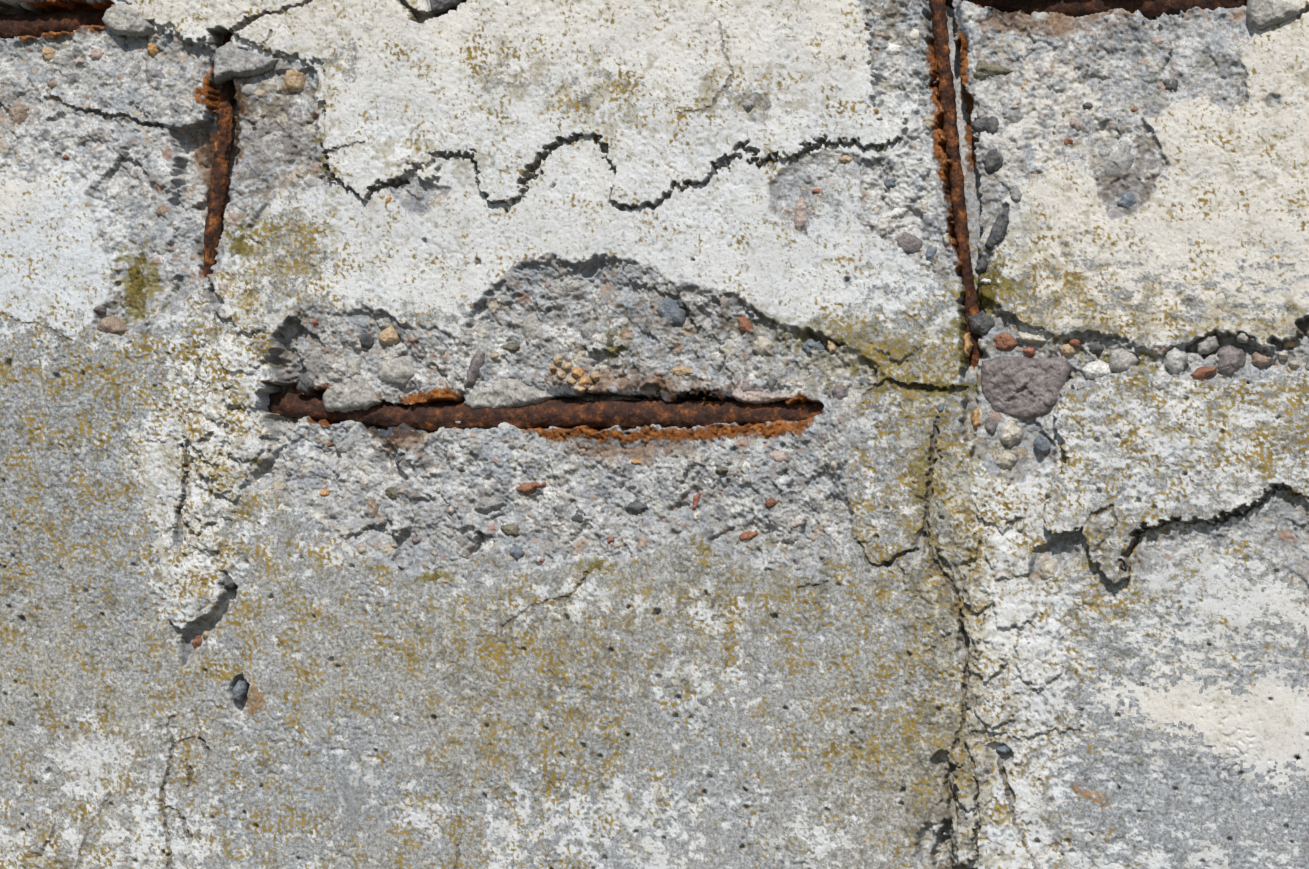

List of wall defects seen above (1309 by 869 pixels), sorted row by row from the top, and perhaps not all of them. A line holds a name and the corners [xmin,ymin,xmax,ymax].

rust [19,0,114,41]
crack [207,0,313,47]
crack [396,0,467,23]
rust [195,63,237,115]
crack [320,132,905,211]
rust [926,24,976,272]
flaking render [0,0,1309,670]
rust [523,392,824,445]
crack [854,378,977,752]
crack [1083,482,1309,580]
peeling [1094,650,1309,794]
peeling [1188,840,1233,869]